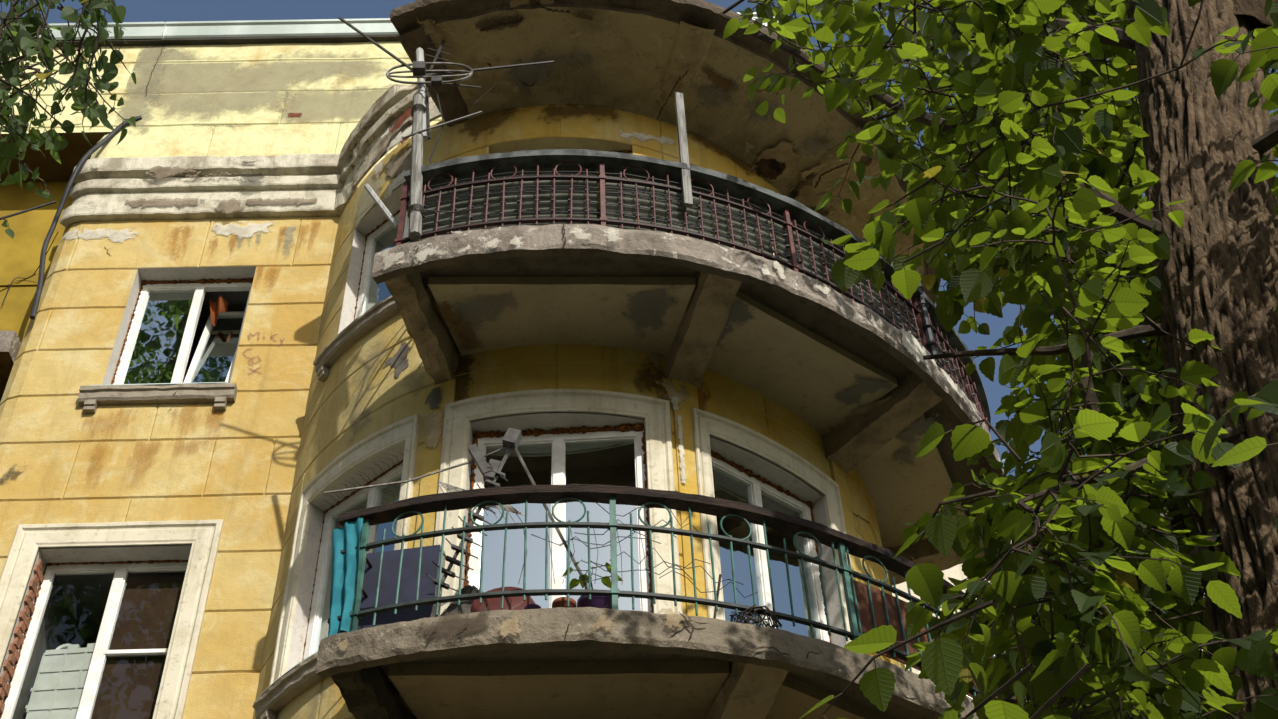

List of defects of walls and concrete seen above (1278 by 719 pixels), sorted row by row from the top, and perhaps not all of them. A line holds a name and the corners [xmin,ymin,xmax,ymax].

damp [120,45,386,129]
damp [460,108,519,140]
damp [539,104,618,124]
damp [686,131,757,175]
spalling [751,141,876,216]
peeling [382,341,411,379]